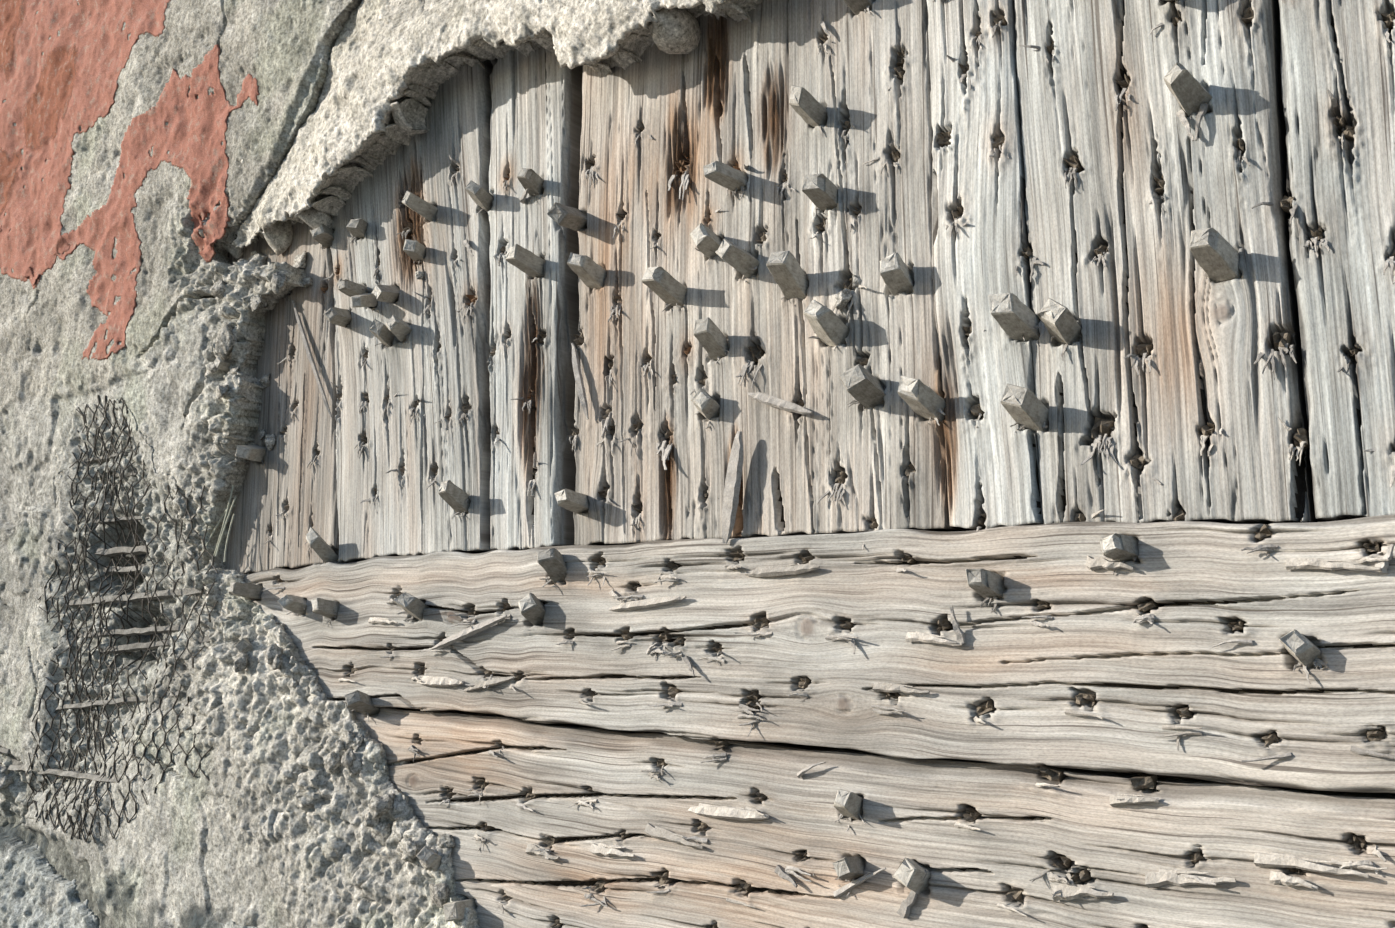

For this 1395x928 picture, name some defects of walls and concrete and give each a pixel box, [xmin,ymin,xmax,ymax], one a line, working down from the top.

peeling [0,0,260,360]
spalling [0,398,218,829]